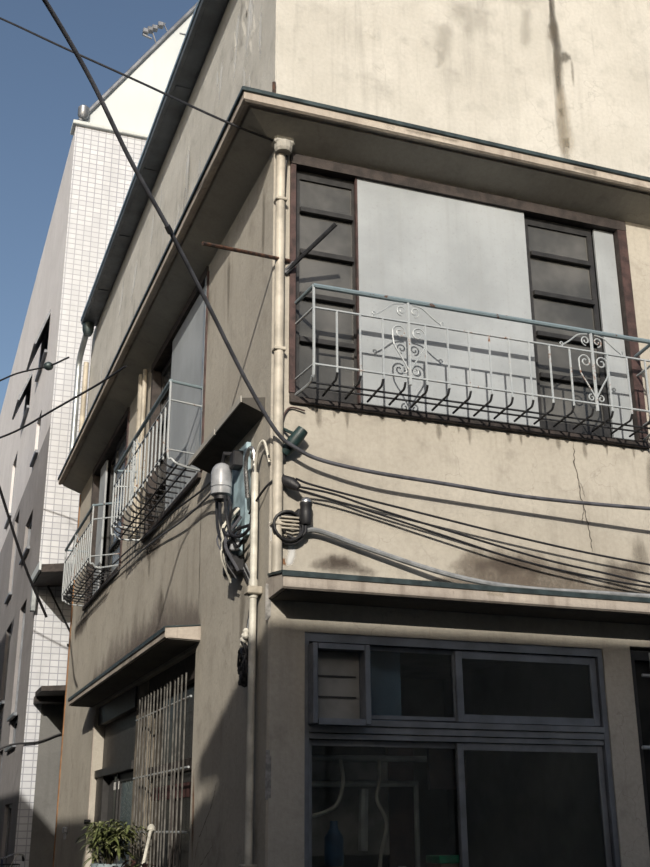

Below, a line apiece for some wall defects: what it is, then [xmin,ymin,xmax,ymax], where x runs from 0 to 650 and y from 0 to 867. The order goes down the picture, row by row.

damp [549,0,570,89]
crack [573,443,593,552]
damp [320,557,364,571]
damp [442,556,650,594]
damp [102,613,198,673]